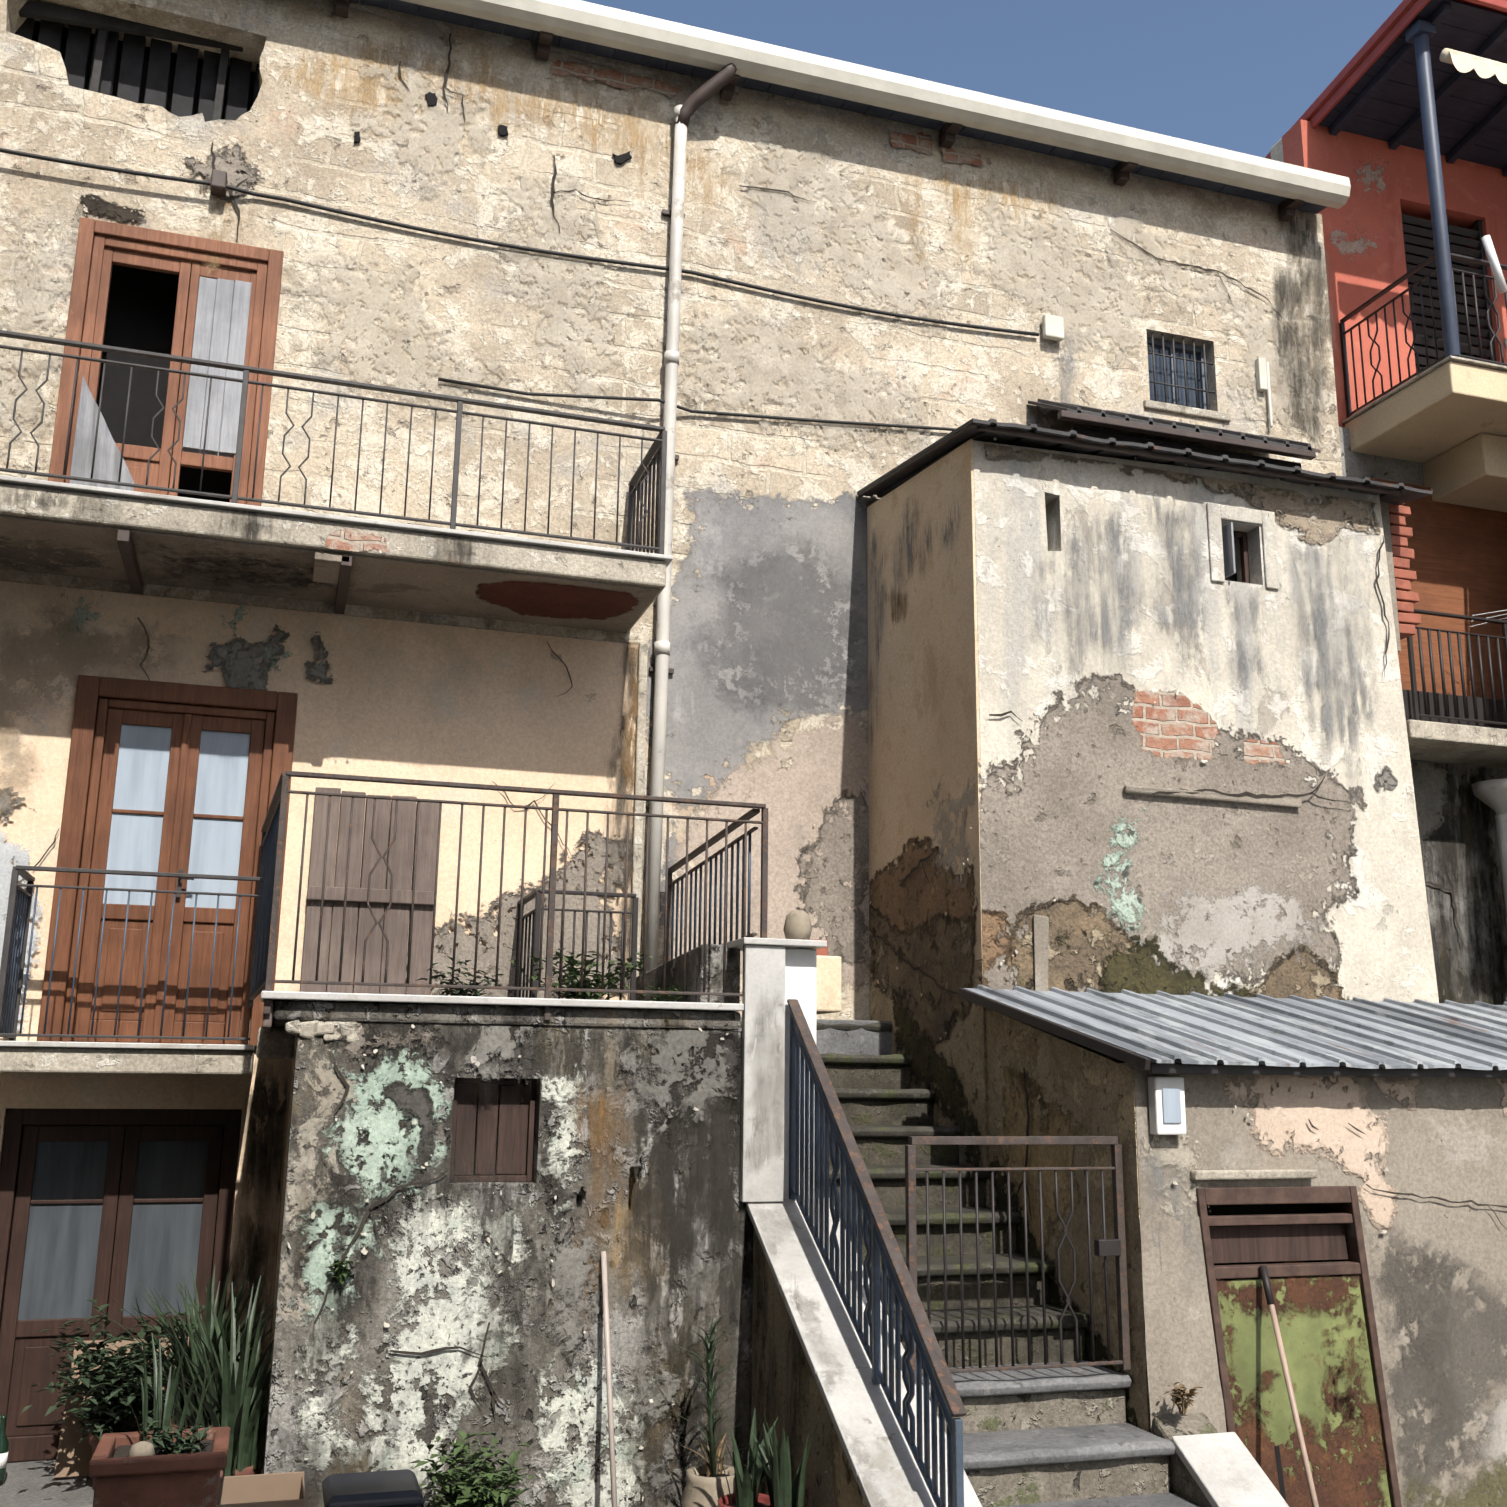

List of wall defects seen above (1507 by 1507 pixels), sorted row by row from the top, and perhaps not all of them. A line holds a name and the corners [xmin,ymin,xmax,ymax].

flaking render [1132,689,1234,763]
flaking render [1243,739,1286,765]